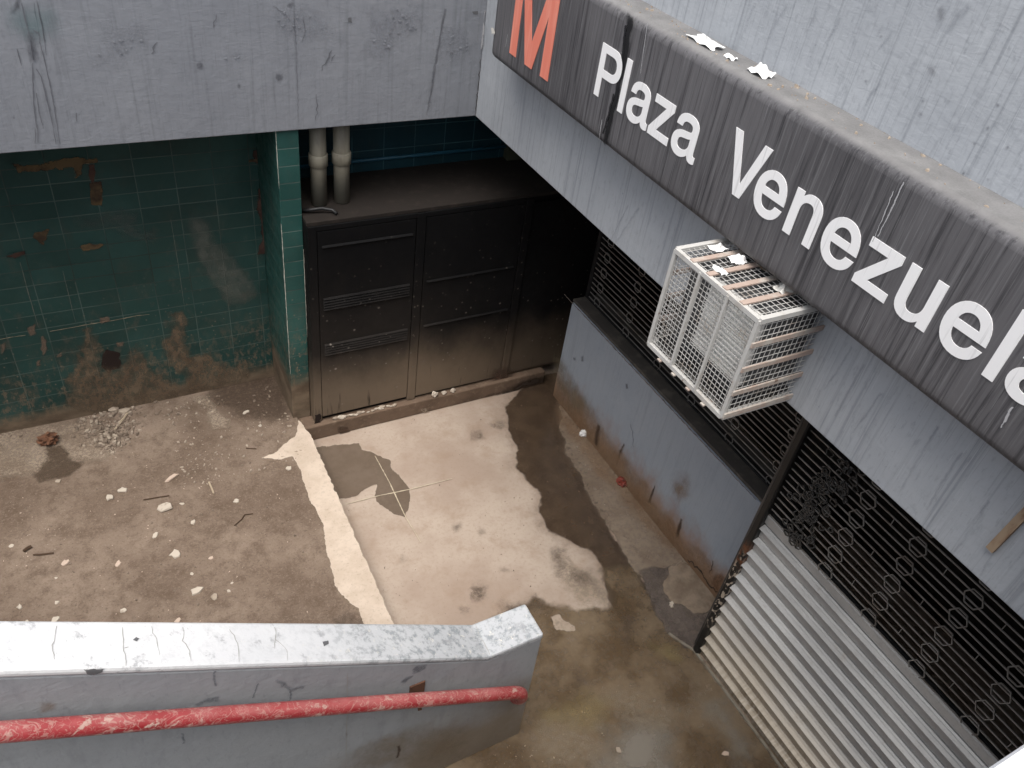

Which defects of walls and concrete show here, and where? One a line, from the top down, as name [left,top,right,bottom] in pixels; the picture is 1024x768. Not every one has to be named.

leakage [599,15,633,144]
spalling [13,157,103,206]
spalling [101,350,121,376]
leakage [163,312,286,429]
leakage [498,373,709,660]